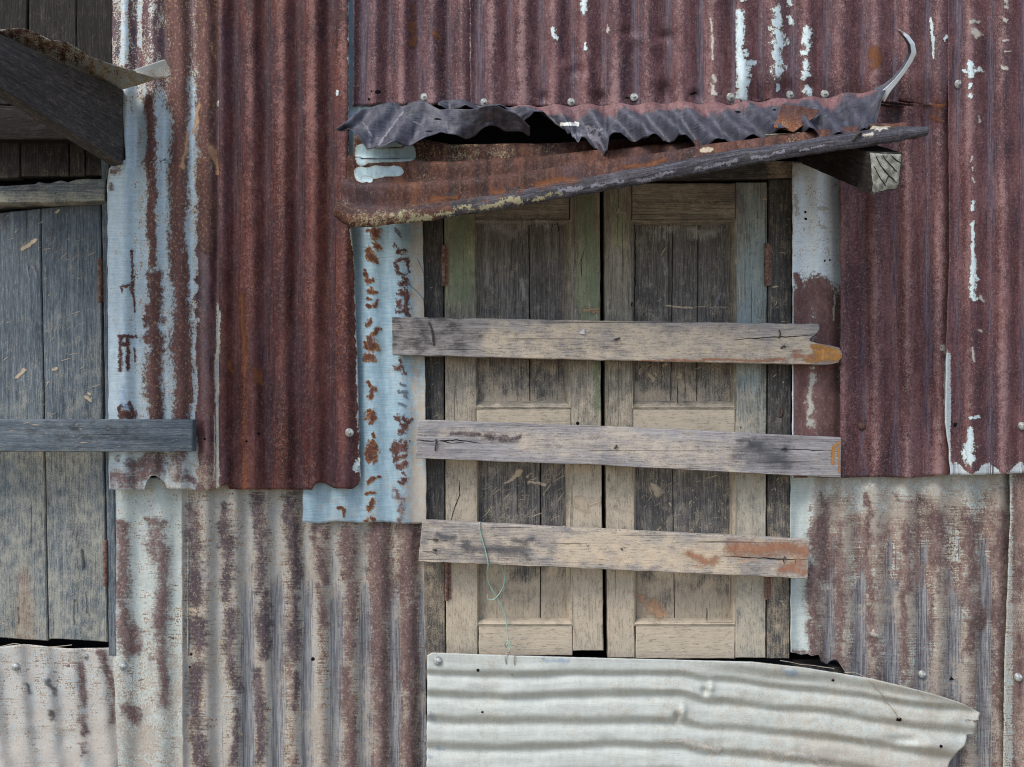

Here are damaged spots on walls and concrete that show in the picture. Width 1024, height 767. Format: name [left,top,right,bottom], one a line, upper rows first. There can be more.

peeling [736,0,757,101]
peeling [768,0,814,96]
peeling [962,60,984,99]
rust [117,0,219,419]
rust [361,226,412,363]
rust [793,271,841,347]
peeling [968,199,985,303]
rust [793,360,841,437]
rust [115,517,172,709]
rust [182,492,331,767]
rust [336,380,424,767]
rust [792,492,848,668]